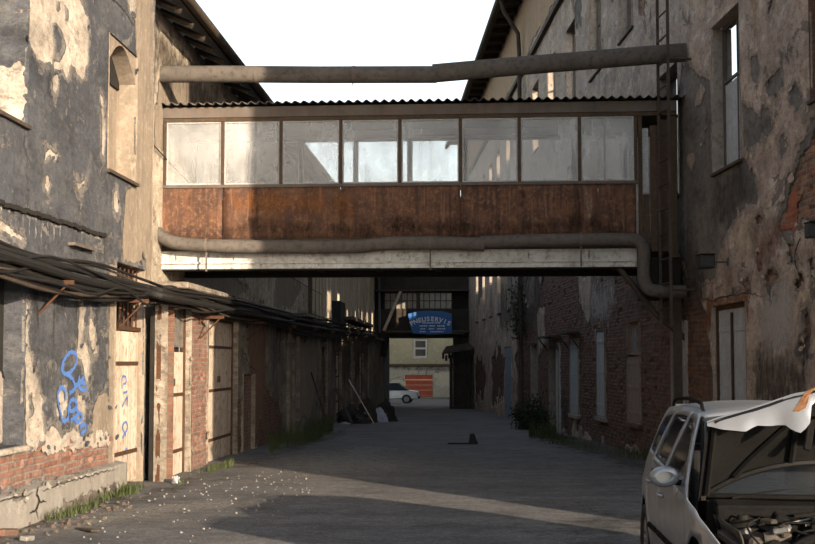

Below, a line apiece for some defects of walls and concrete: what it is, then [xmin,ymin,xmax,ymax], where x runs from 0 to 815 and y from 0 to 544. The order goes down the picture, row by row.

peeling [27,0,90,92]
peeling [572,0,582,29]
peeling [0,61,28,122]
peeling [751,54,802,112]
peeling [677,64,772,404]
flaking render [755,118,815,303]
flaking render [0,300,119,503]
flaking render [475,343,505,408]
flaking render [515,276,671,454]
flaking render [795,308,812,357]
spalling [63,483,116,510]